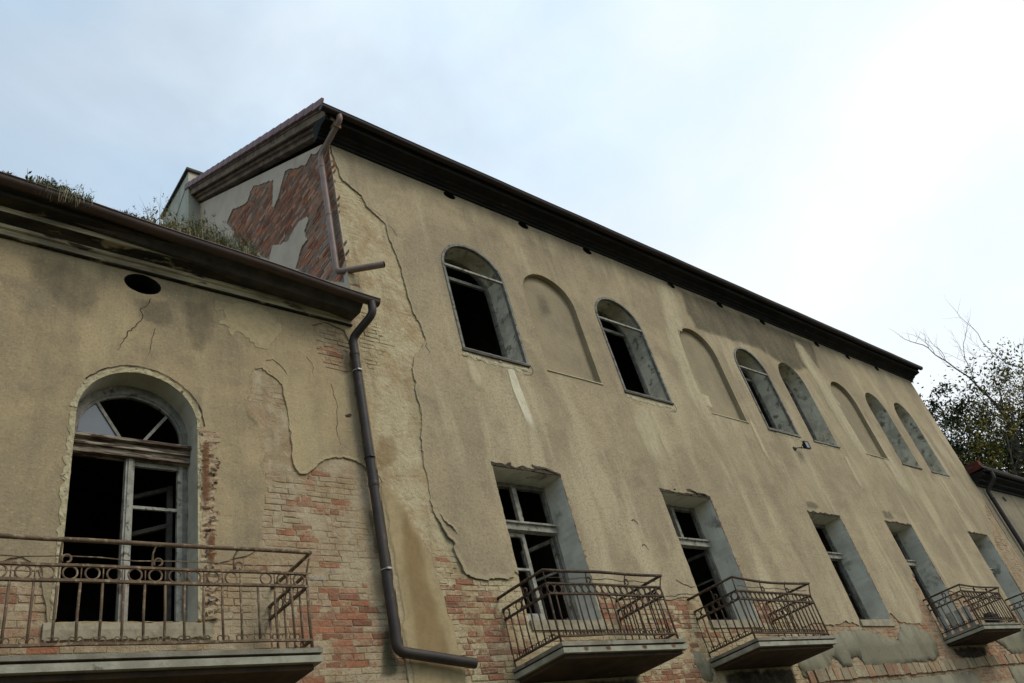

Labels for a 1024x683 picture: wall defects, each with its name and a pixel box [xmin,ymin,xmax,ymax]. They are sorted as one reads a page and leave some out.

crack [119,299,155,354]
crack [330,147,430,352]
flaking render [0,146,1024,683]